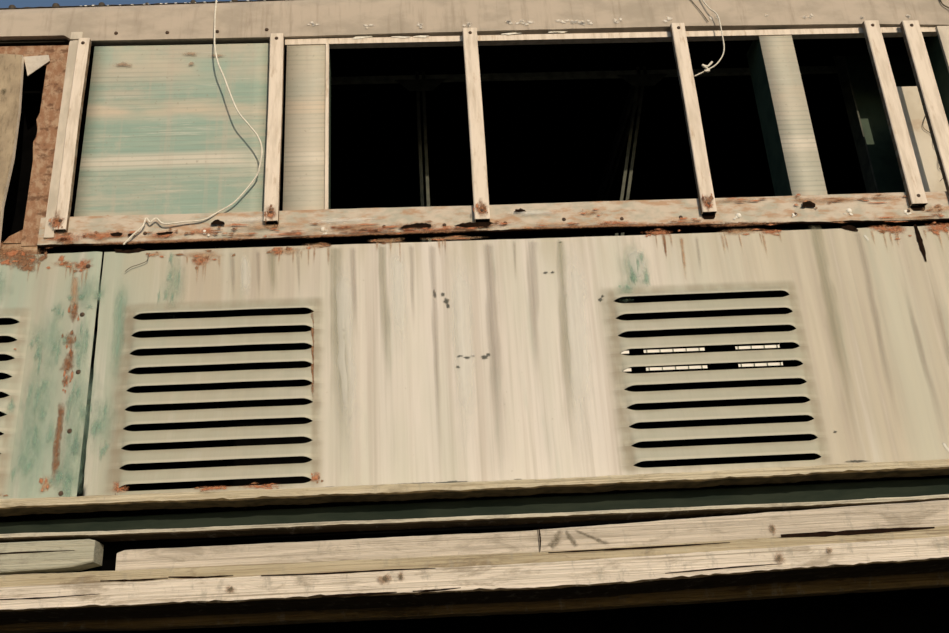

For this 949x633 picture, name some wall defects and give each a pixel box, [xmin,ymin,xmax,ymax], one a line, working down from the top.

rust [49,201,507,269]
rust [525,209,781,253]
rust [794,194,891,209]
rust [872,204,949,240]
rust [0,242,90,393]
rust [39,405,64,491]